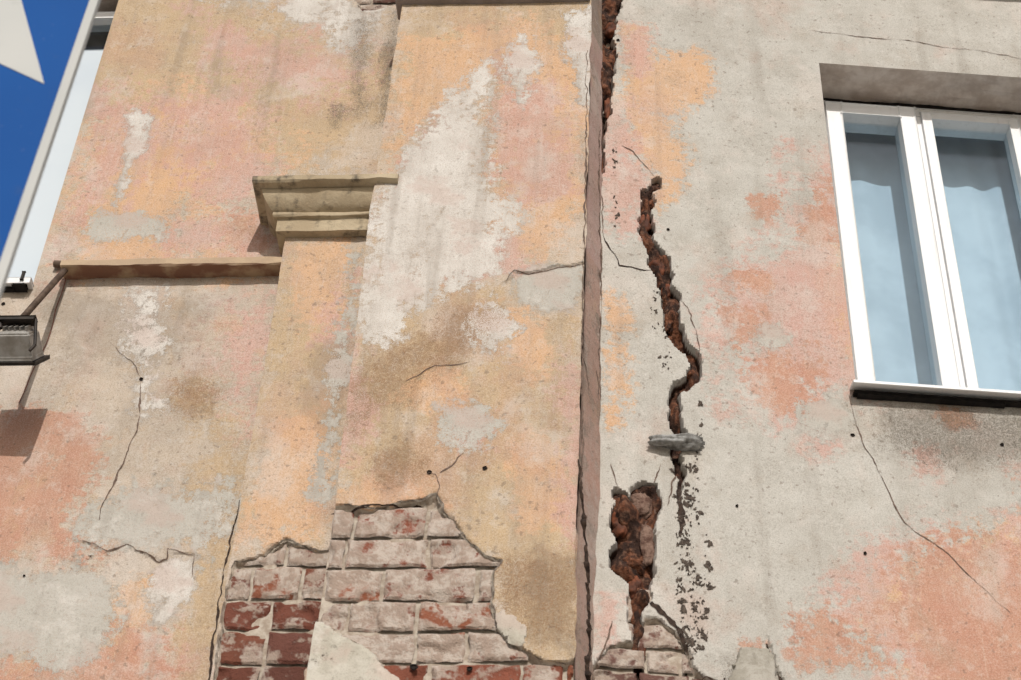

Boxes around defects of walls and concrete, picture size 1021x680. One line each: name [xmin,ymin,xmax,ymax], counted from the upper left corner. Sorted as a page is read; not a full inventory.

peeling [242,0,396,56]
peeling [559,2,592,109]
crack [99,342,141,520]
crack [83,540,194,576]
crack [208,500,240,680]
spalling [213,32,584,680]
crack [506,0,725,680]
spalling [593,595,704,680]
crack [849,396,1009,611]